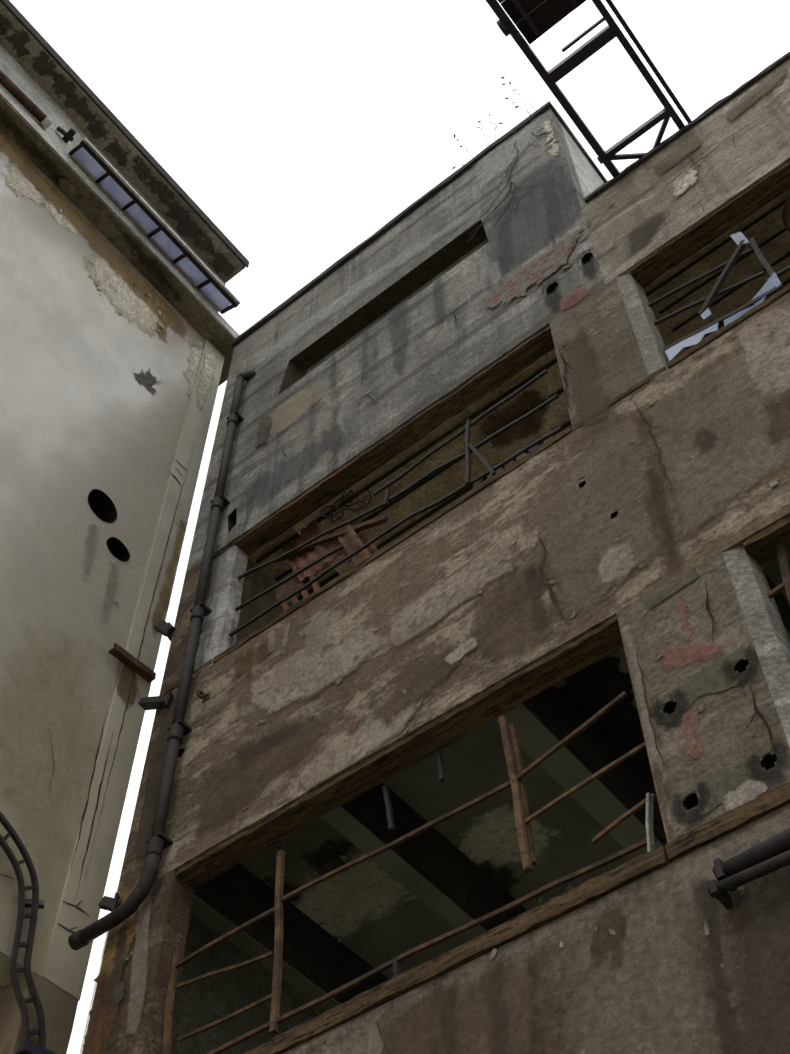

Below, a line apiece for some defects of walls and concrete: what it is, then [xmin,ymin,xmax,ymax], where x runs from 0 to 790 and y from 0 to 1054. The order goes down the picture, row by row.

spalling [0,14,241,277]
peeling [83,251,164,338]
peeling [182,313,217,411]
crack [138,447,194,659]
crack [705,581,714,643]
crack [750,685,774,749]
crack [58,701,129,933]
corrosion [80,968,118,1054]
damp [369,946,565,1054]
damp [694,880,790,1054]